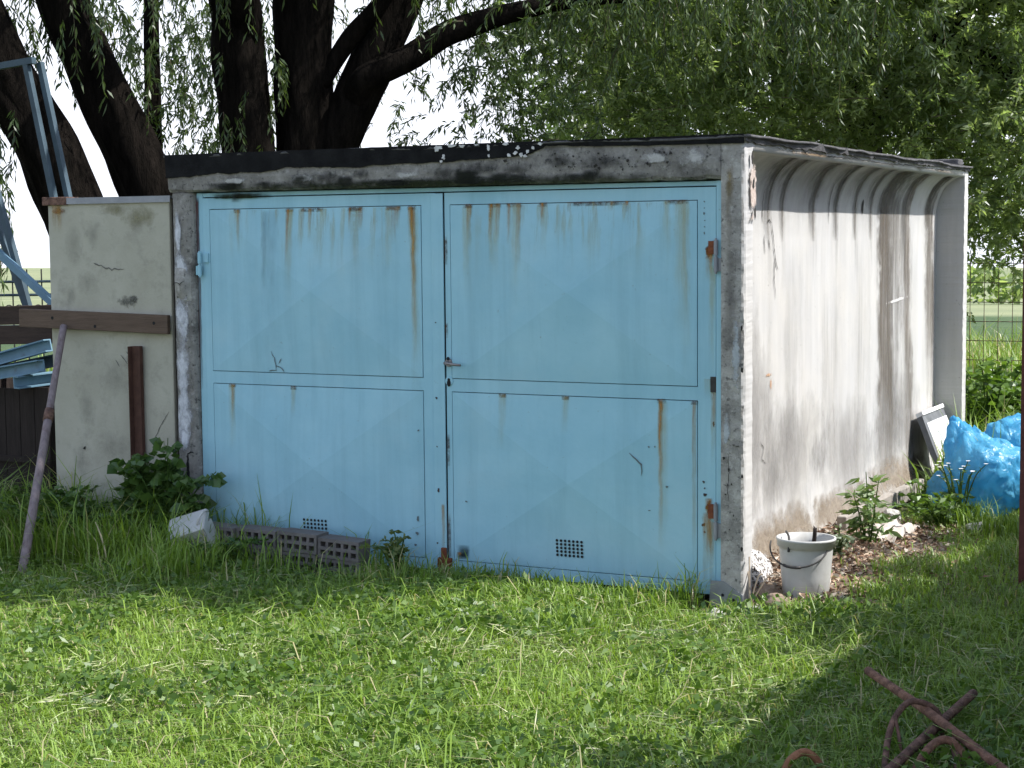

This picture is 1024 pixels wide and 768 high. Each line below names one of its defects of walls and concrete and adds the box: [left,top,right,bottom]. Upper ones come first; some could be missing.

water stain [210,157,615,200]
peeling [487,142,542,158]
rust [387,206,414,273]
water stain [813,164,953,394]
water stain [752,374,760,456]